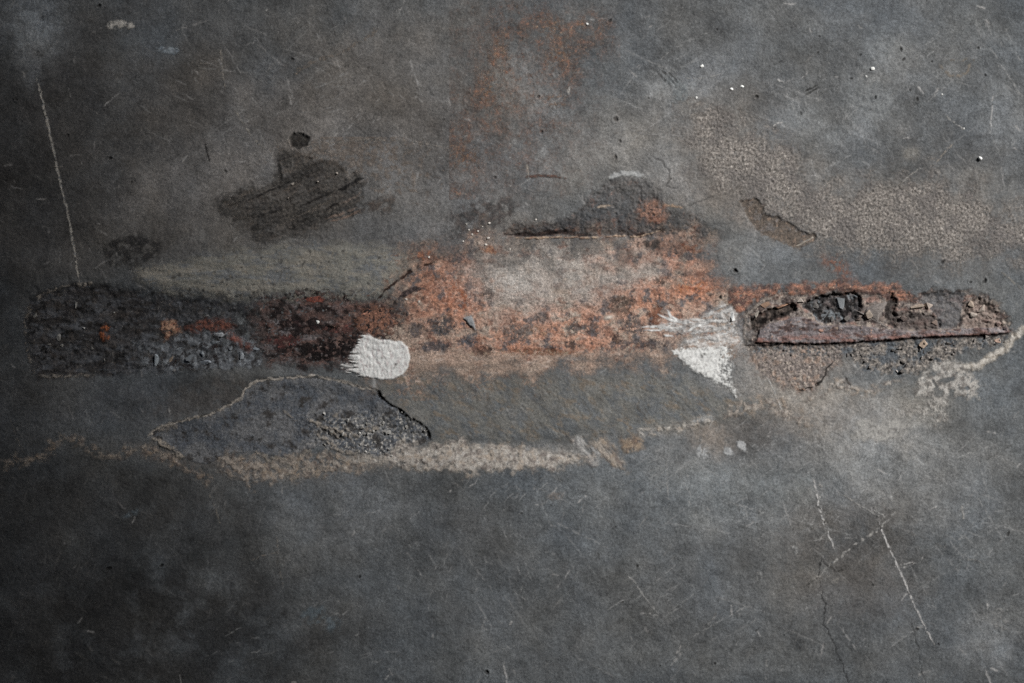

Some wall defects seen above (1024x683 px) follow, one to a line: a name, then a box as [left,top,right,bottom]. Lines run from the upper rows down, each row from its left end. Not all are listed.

flaking render [6,282,711,487]
corrosion [161,224,912,401]
spalling [504,220,672,249]
corrosion [756,317,1009,344]